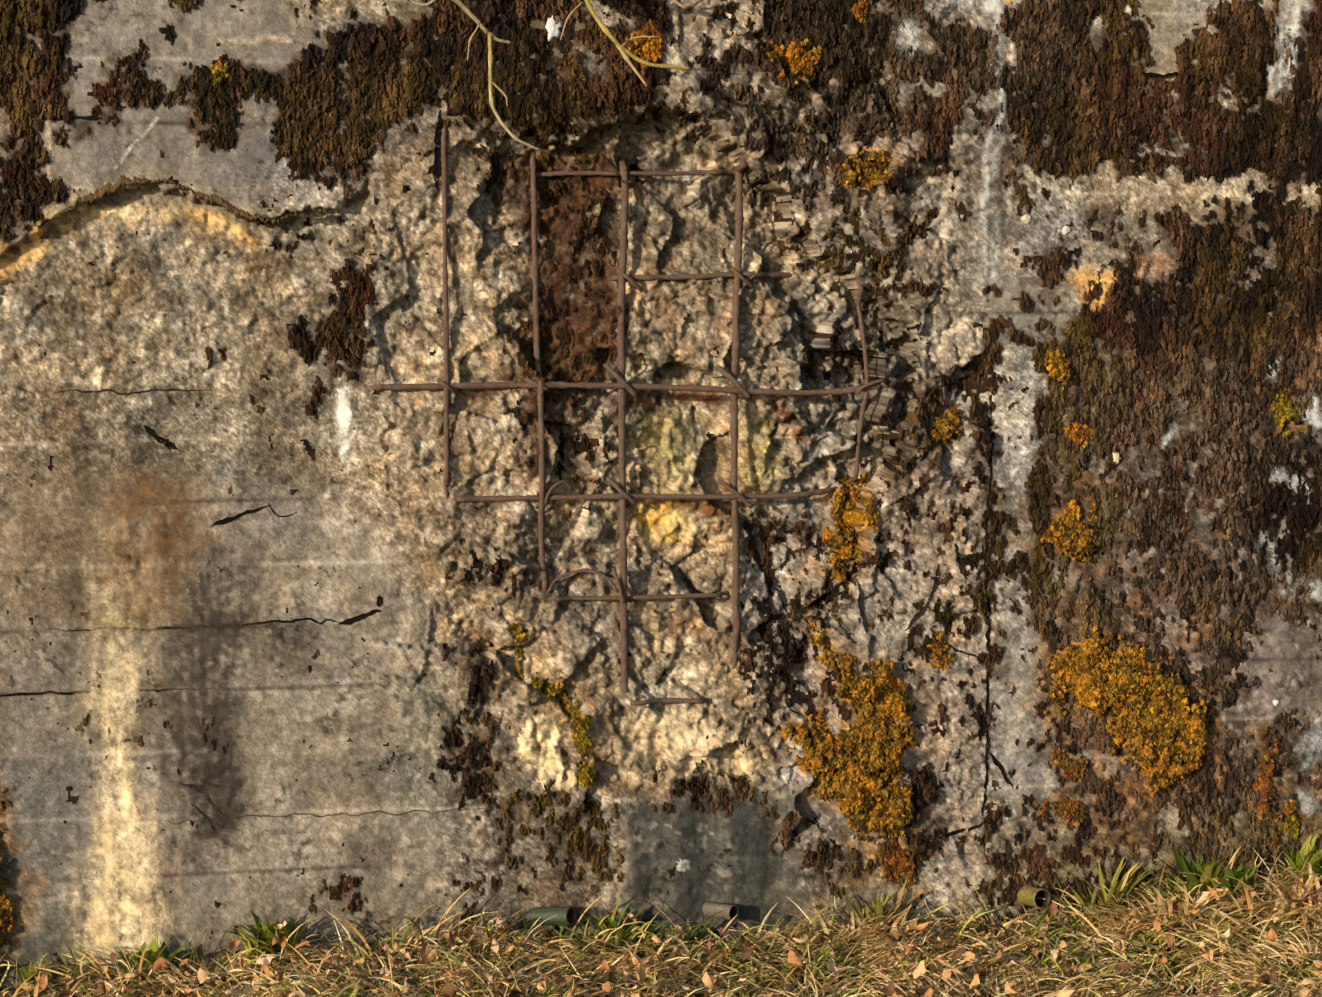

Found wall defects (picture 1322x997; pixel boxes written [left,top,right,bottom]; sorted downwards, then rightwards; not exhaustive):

leakage [982,0,1002,28]
leakage [980,65,1004,279]
rust [521,152,626,420]
spalling [0,107,924,813]
rust [636,385,719,405]
rust [774,402,803,444]
crack [0,688,214,697]
crack [46,624,207,632]
leakage [92,483,261,860]
crack [244,595,383,626]
crack [904,369,1013,857]
leakage [73,636,161,971]